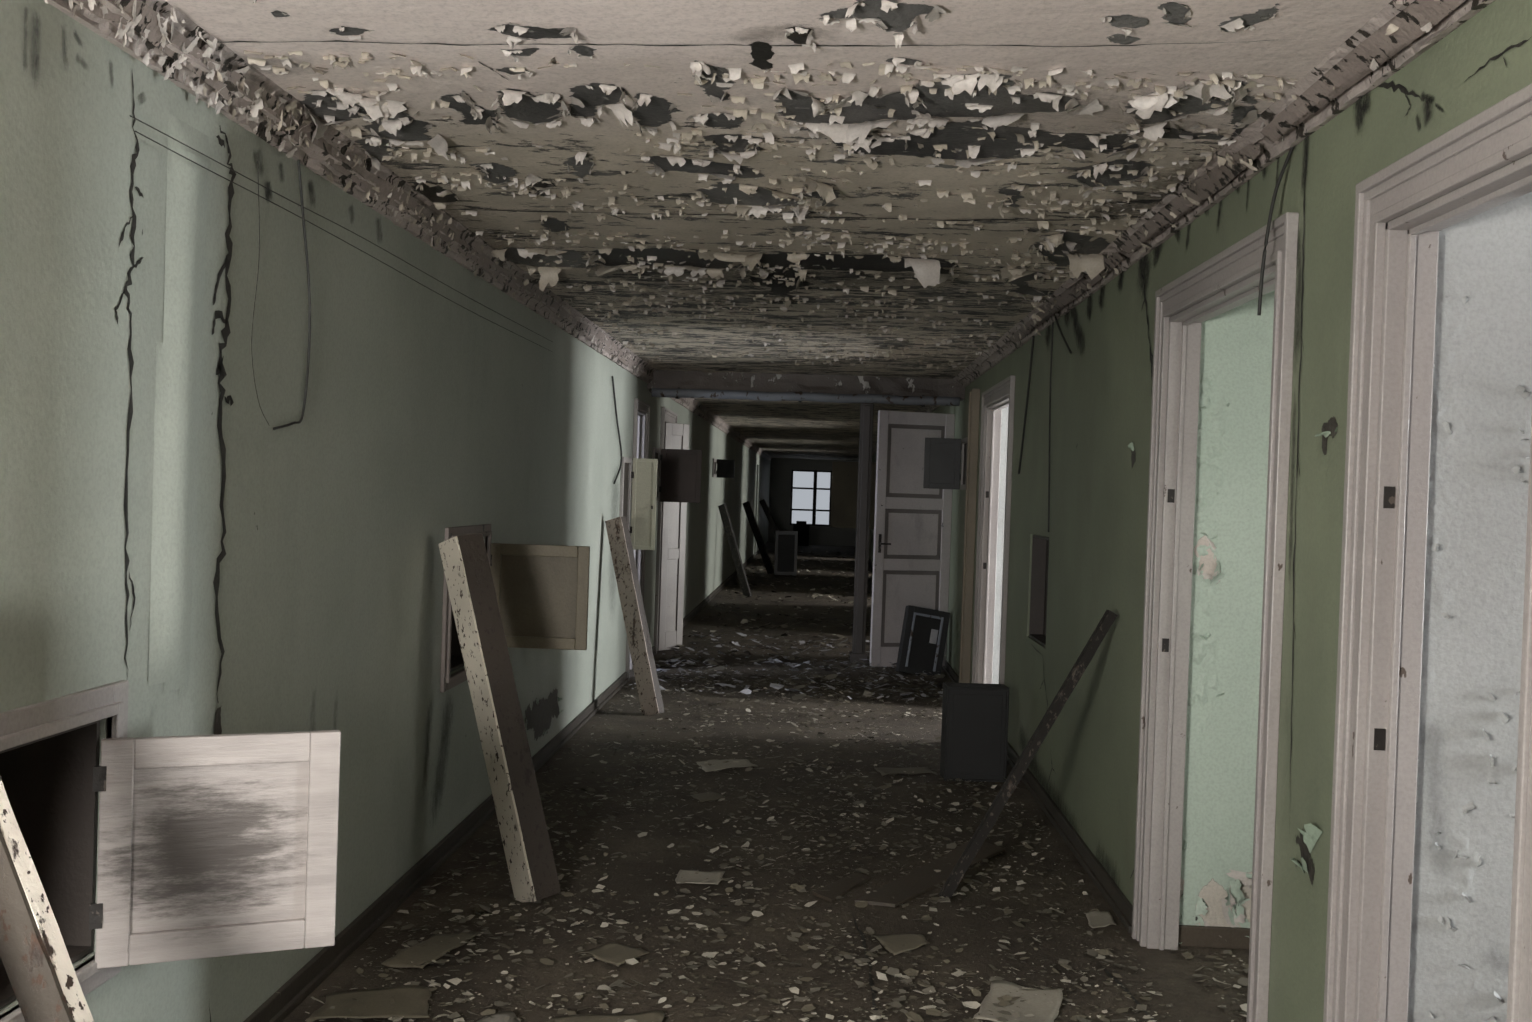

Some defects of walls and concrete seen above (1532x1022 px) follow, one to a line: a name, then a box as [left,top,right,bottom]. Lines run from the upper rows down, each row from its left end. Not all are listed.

peeling [69,0,1466,369]
crack [114,73,144,677]
crack [212,127,236,701]
peeling [1193,532,1225,587]
peeling [1180,869,1252,937]